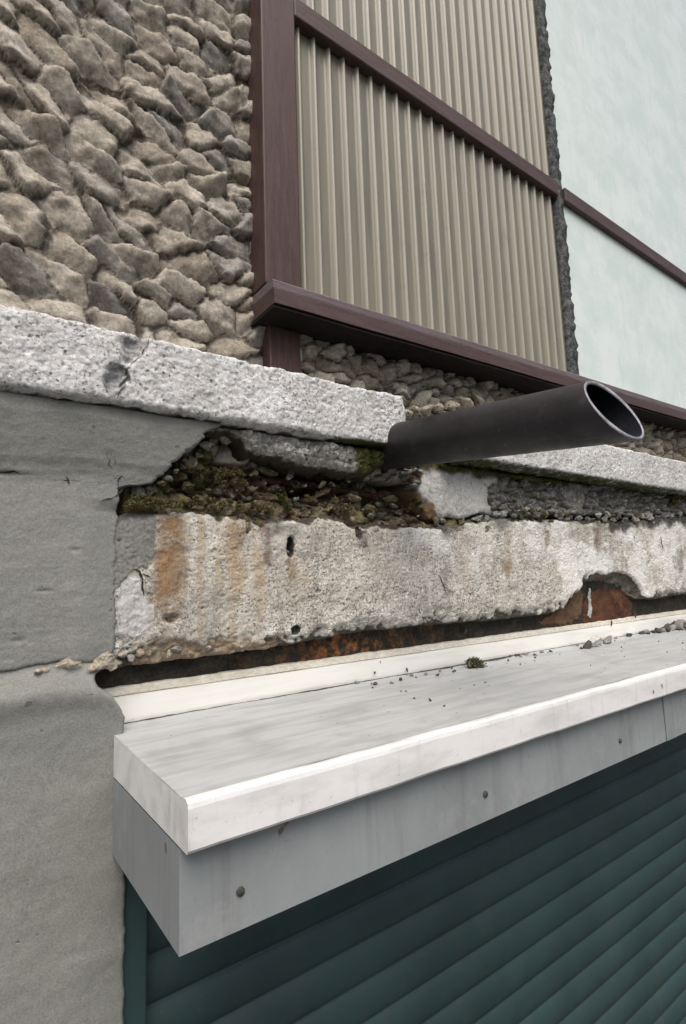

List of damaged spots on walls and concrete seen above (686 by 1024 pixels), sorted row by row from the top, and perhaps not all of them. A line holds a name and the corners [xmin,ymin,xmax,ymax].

spalling [114,427,686,588]
corrosion [155,516,187,600]
spalling [539,573,641,625]